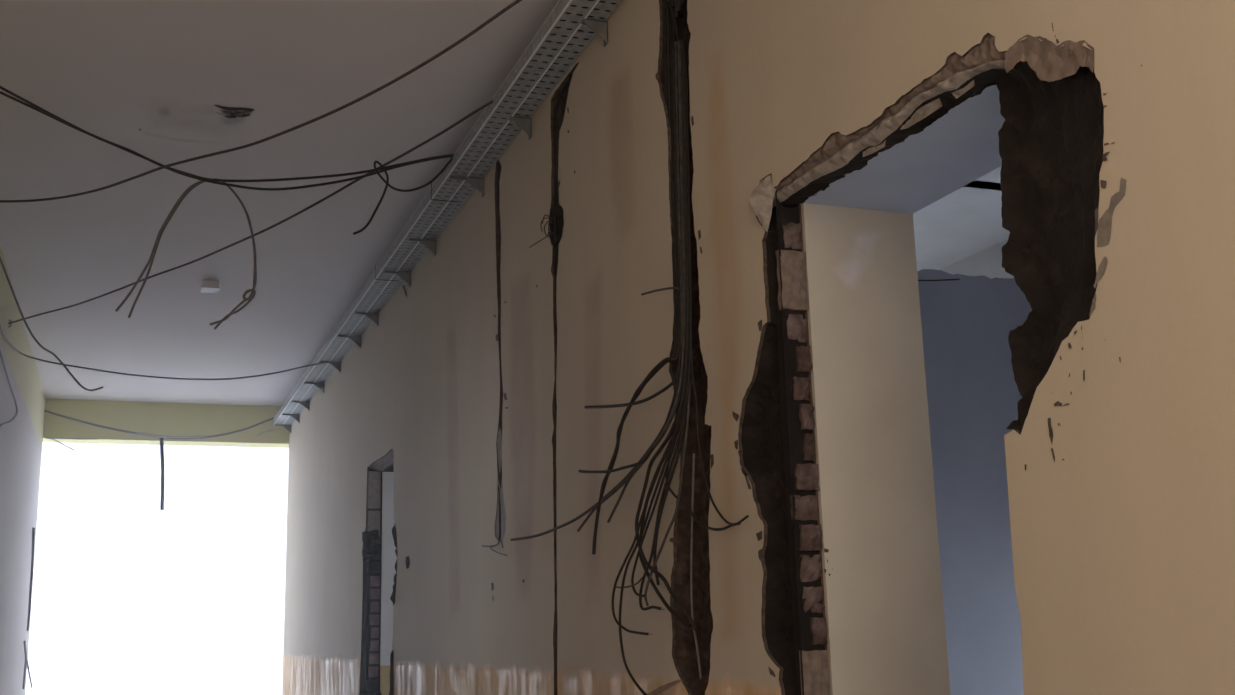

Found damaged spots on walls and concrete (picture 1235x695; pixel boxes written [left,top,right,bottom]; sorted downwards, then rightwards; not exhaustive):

flaking render [359,450,410,695]
spalling [732,23,1126,695]